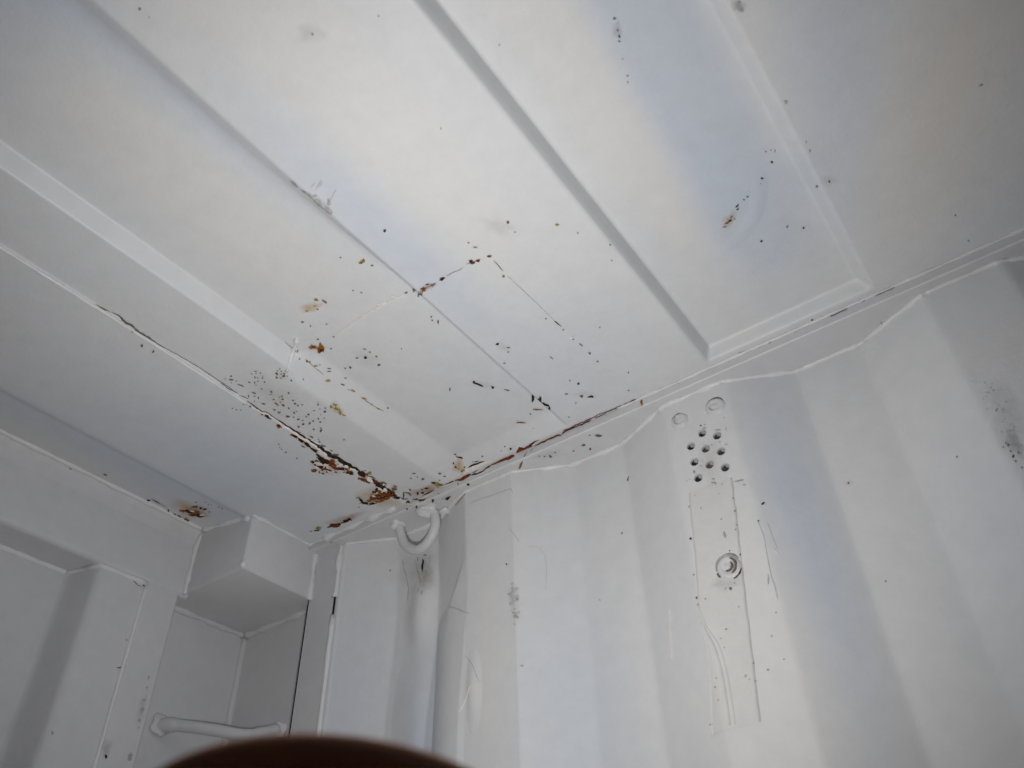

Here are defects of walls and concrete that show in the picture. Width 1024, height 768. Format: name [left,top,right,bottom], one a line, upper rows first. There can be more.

corrosion [179,502,223,522]